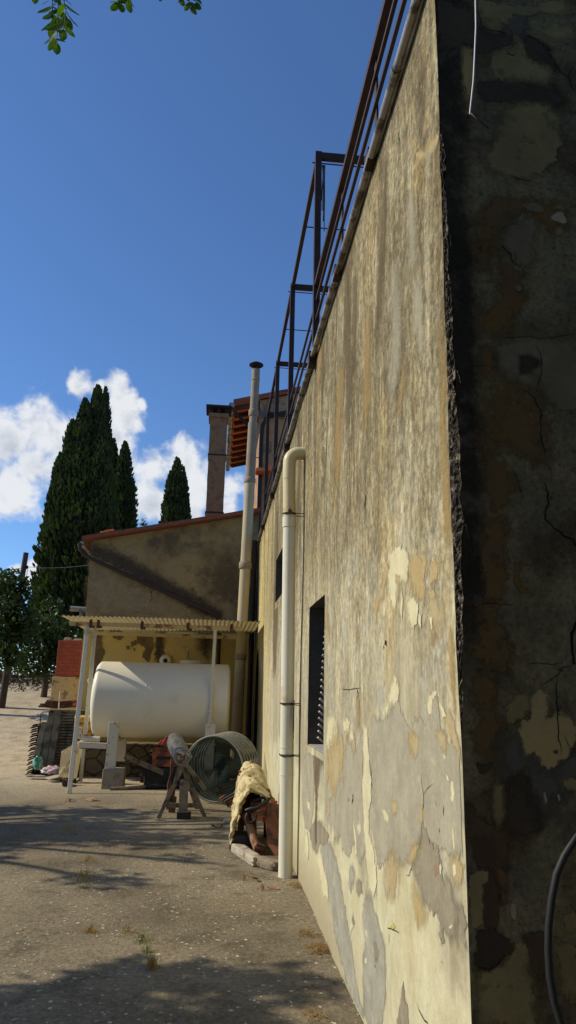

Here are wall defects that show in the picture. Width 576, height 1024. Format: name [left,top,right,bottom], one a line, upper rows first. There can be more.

damp [477,79,567,110]
damp [376,174,387,336]
damp [344,268,356,411]
damp [88,560,178,614]
peeling [302,72,514,1024]
crack [541,479,576,547]
peeling [91,630,154,680]
crack [530,622,576,750]
damp [450,730,576,929]
damp [522,930,545,981]